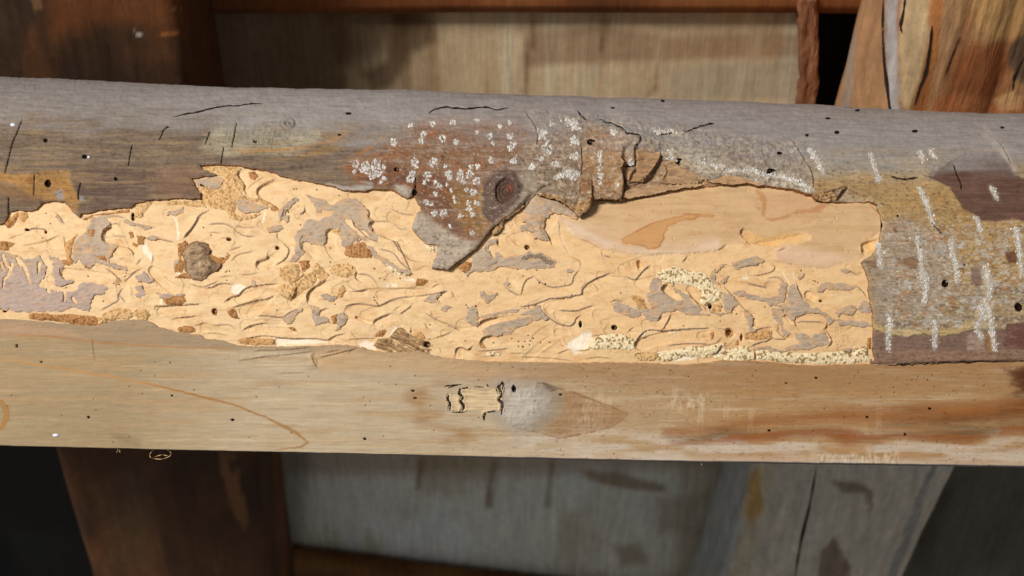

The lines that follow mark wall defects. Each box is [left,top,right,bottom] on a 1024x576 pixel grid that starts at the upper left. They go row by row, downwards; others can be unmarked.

crack [160,103,262,165]
crack [429,105,509,113]
peeling [0,170,79,211]
peeling [0,214,185,313]
peeling [465,195,578,277]
peeling [622,147,763,201]
damp [909,235,929,304]
damp [917,186,936,226]
damp [1010,226,1024,279]
peeling [612,256,1024,364]
damp [886,314,894,353]
damp [974,263,998,340]